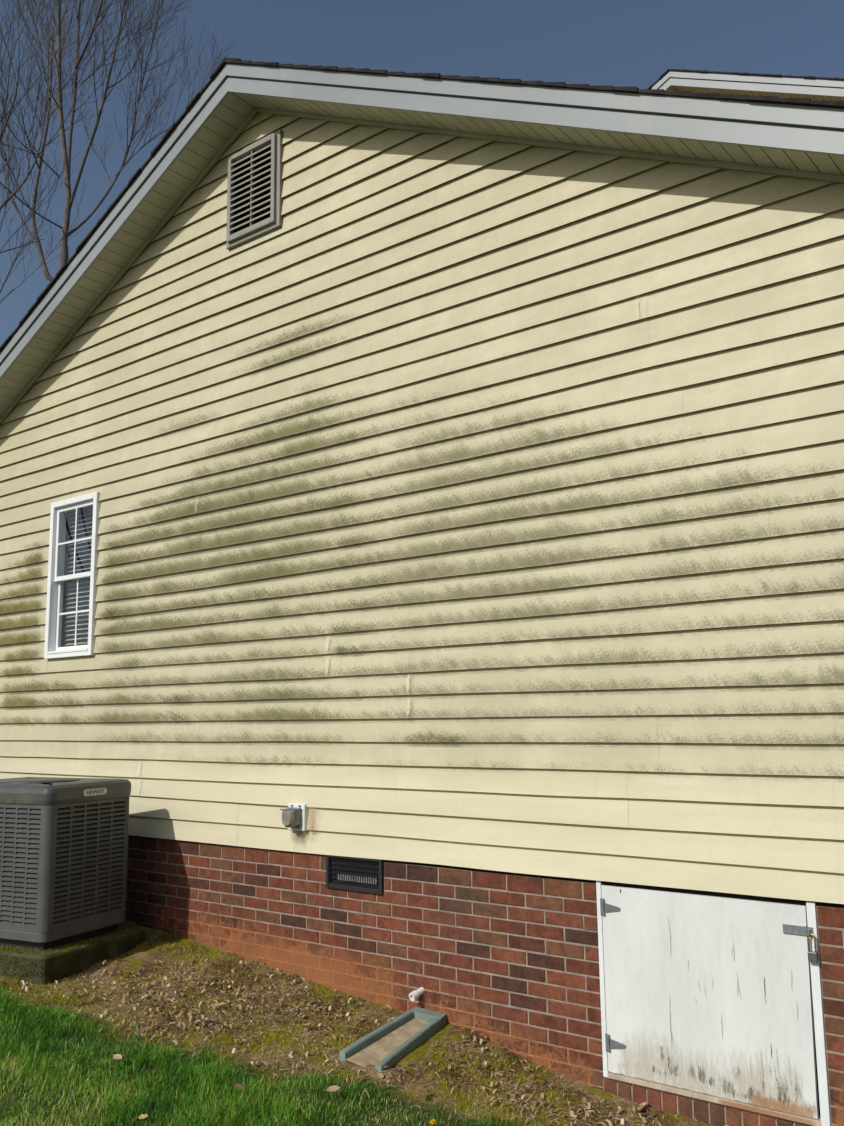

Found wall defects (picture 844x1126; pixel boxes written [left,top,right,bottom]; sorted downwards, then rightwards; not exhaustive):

damp [0,388,788,742]